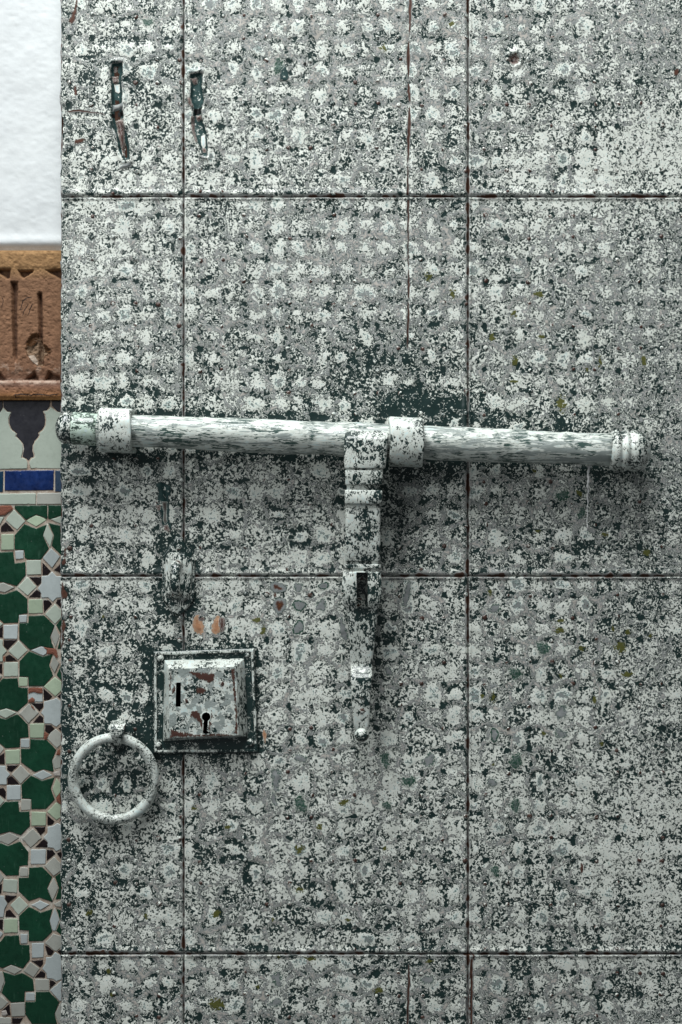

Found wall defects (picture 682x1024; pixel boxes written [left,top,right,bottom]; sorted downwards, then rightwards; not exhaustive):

rust [170,669,238,738]